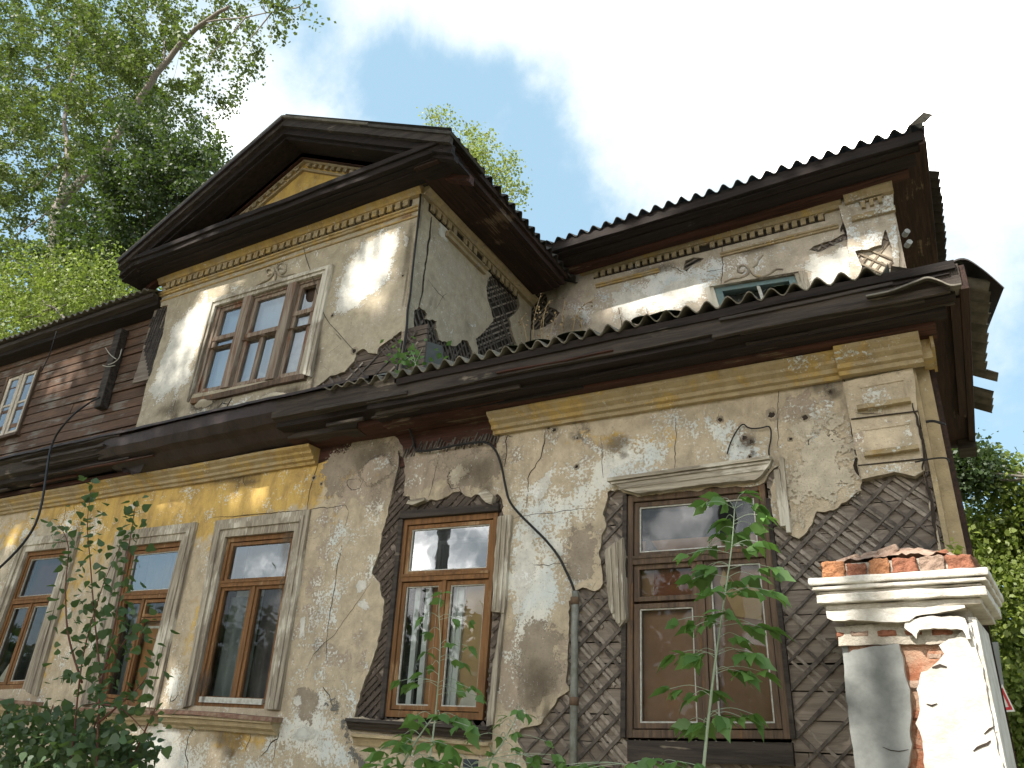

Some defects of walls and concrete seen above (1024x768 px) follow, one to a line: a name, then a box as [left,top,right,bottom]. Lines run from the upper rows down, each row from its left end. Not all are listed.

spalling [321,275,517,386]
crack [418,217,444,309]
spalling [530,293,588,336]
flaking render [799,232,893,285]
crack [214,462,371,705]
spalling [311,439,506,724]
spalling [472,491,638,768]
spalling [652,411,971,768]